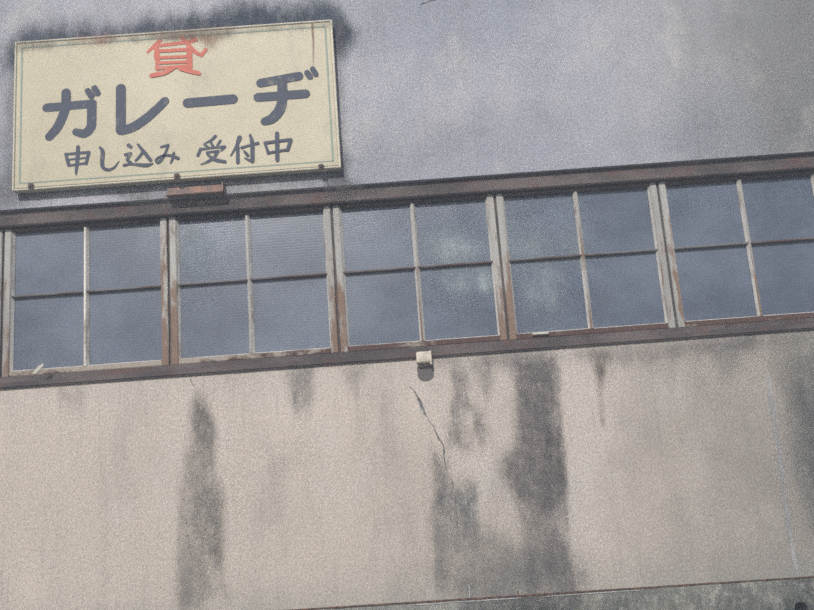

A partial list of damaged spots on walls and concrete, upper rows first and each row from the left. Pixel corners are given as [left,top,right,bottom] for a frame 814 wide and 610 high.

leakage [129,10,276,34]
leakage [286,5,348,45]
crack [296,379,814,610]